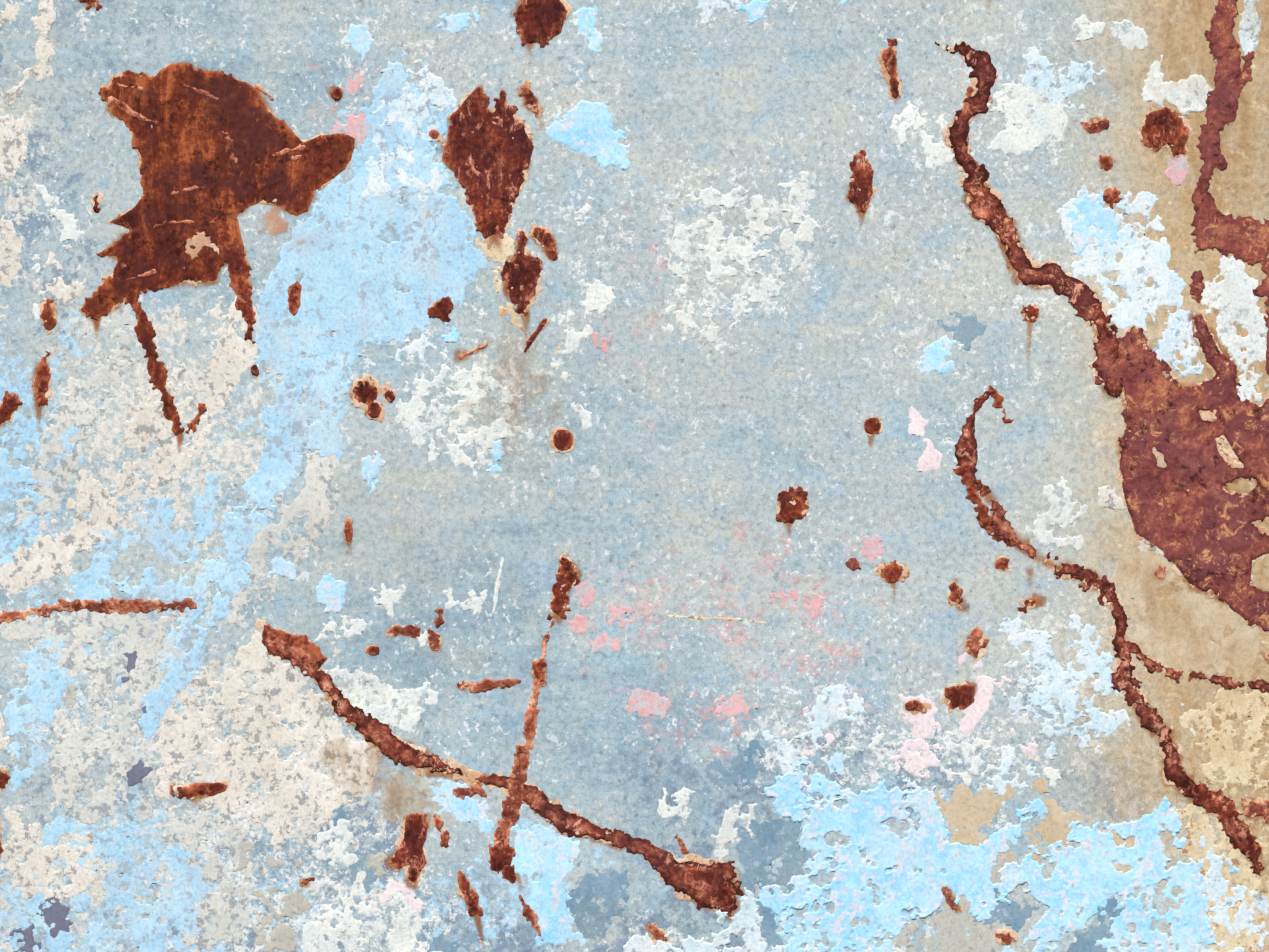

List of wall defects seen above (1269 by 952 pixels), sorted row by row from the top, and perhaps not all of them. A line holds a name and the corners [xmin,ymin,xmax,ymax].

corrosion [79,62,355,446]
corrosion [427,80,558,326]
corrosion [513,0,573,50]
peeling [987,45,1105,156]
peeling [1056,185,1269,402]
peeling [1141,55,1214,116]
corrosion [1137,0,1269,375]
peeling [0,59,535,952]
corrosion [1088,270,1269,635]
corrosion [385,813,450,888]
peeling [510,823,630,947]
peeling [623,614,1269,952]